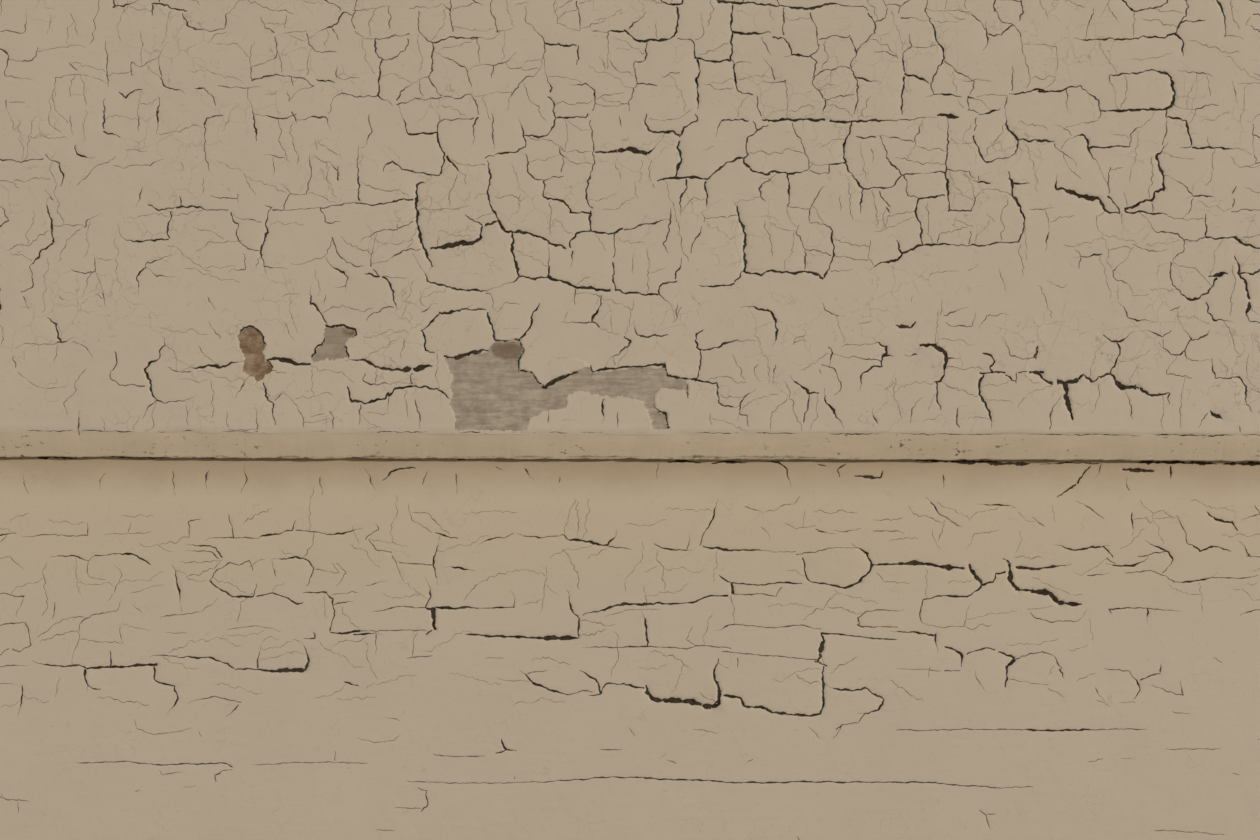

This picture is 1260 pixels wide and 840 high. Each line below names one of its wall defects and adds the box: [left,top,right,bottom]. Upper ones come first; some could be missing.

peeling [237,325,273,382]
peeling [311,324,357,363]
peeling [445,333,698,431]
crack [0,457,1260,739]
crack [83,718,398,788]
crack [382,729,1031,831]